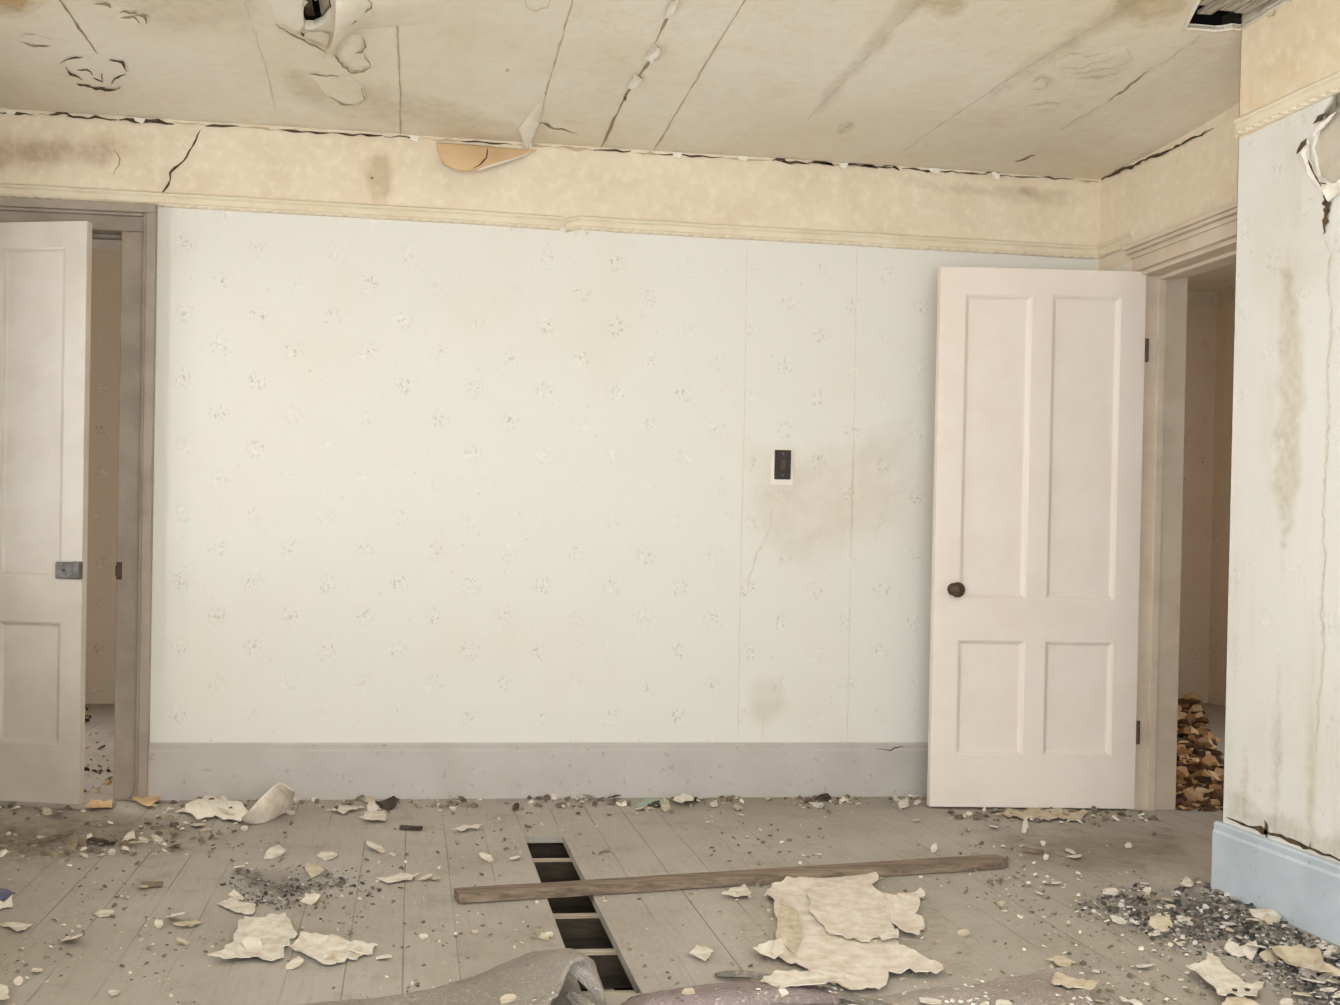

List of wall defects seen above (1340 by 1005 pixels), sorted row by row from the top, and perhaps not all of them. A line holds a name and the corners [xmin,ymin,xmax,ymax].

peeling [270,0,331,35]
crack [0,0,1213,192]
flaking render [1296,112,1340,202]
crack [1314,195,1333,748]